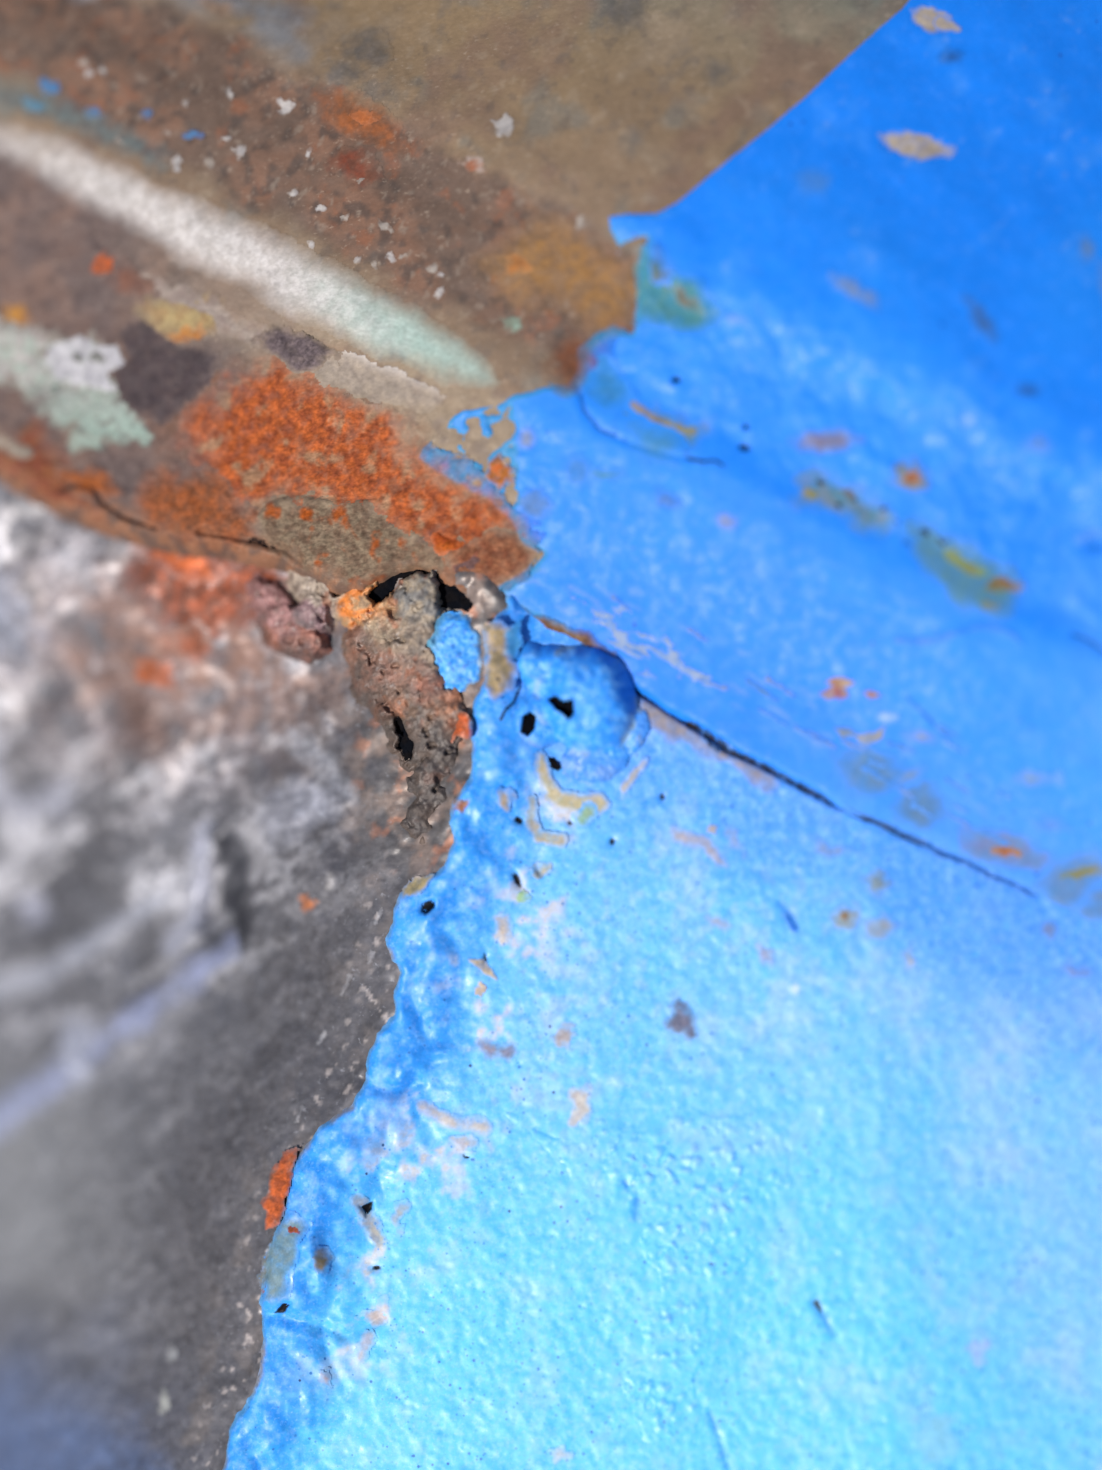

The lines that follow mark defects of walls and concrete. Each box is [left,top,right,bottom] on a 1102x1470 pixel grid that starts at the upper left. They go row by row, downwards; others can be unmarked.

peeling [909,4,966,67]
peeling [877,128,957,162]
peeling [0,70,502,460]
crack [59,483,158,531]
crack [248,537,275,549]
corrosion [0,348,545,775]
corrosion [787,454,1029,622]
peeling [369,569,1009,846]
corrosion [453,798,470,814]
peeling [468,749,649,997]
crack [634,688,1036,897]
corrosion [257,1145,336,1310]